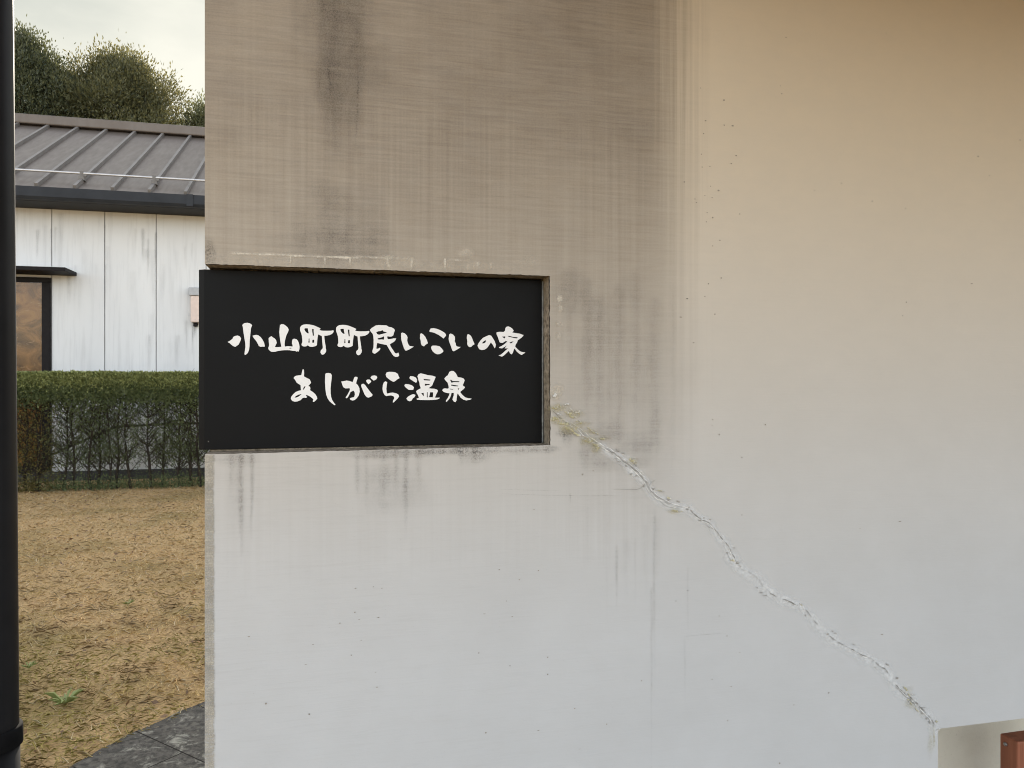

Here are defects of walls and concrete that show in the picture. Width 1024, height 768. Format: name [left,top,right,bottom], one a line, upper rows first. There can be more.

damp [232,252,398,267]
crack [551,393,940,737]